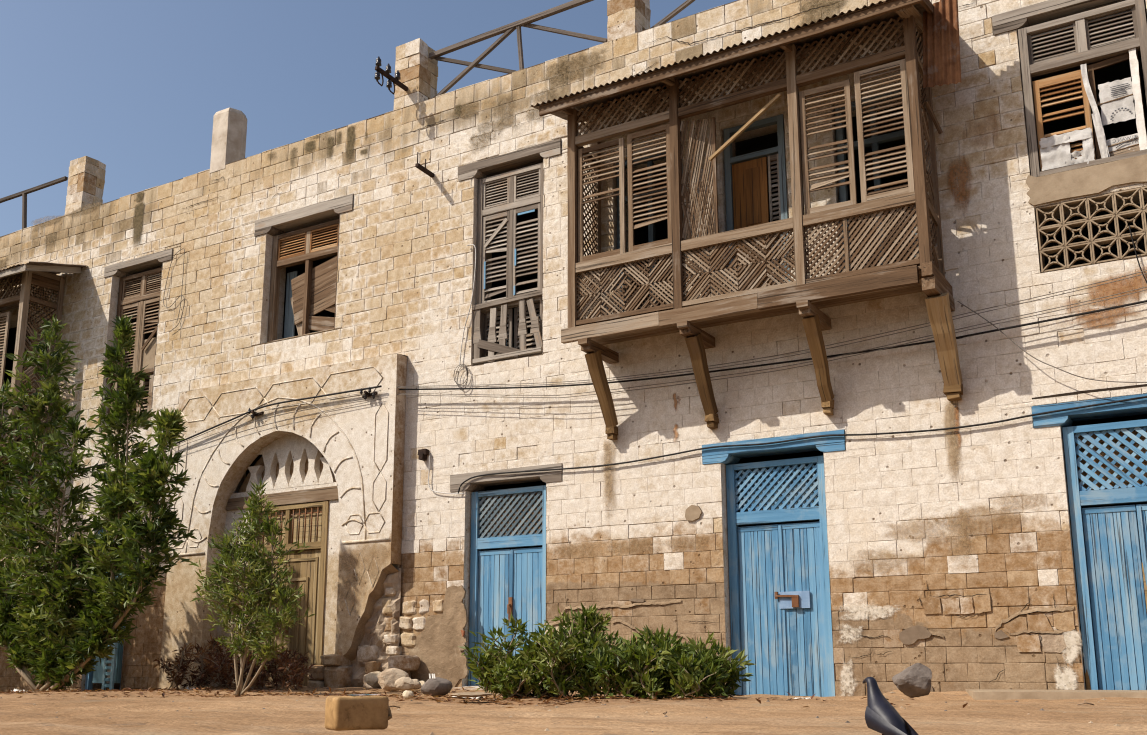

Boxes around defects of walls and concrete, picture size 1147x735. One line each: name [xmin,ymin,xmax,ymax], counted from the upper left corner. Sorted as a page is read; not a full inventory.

mould [800,0,847,25]
rust [948,159,969,206]
rust [1067,270,1147,328]
spalling [307,568,444,688]
spalling [899,595,991,645]
spalling [995,611,1075,653]